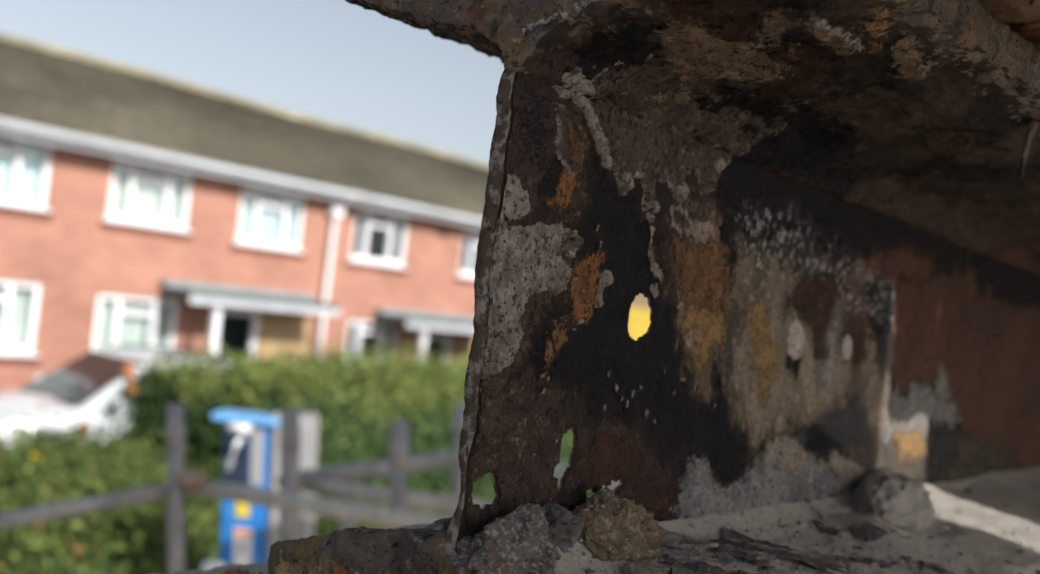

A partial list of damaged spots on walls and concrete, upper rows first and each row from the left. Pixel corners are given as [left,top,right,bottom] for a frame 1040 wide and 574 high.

peeling [809,4,931,80]
peeling [553,72,635,191]
peeling [500,173,531,222]
peeling [646,182,692,237]
peeling [562,228,583,259]
corrosion [465,42,891,574]
peeling [419,517,452,532]
corrosion [918,560,954,574]